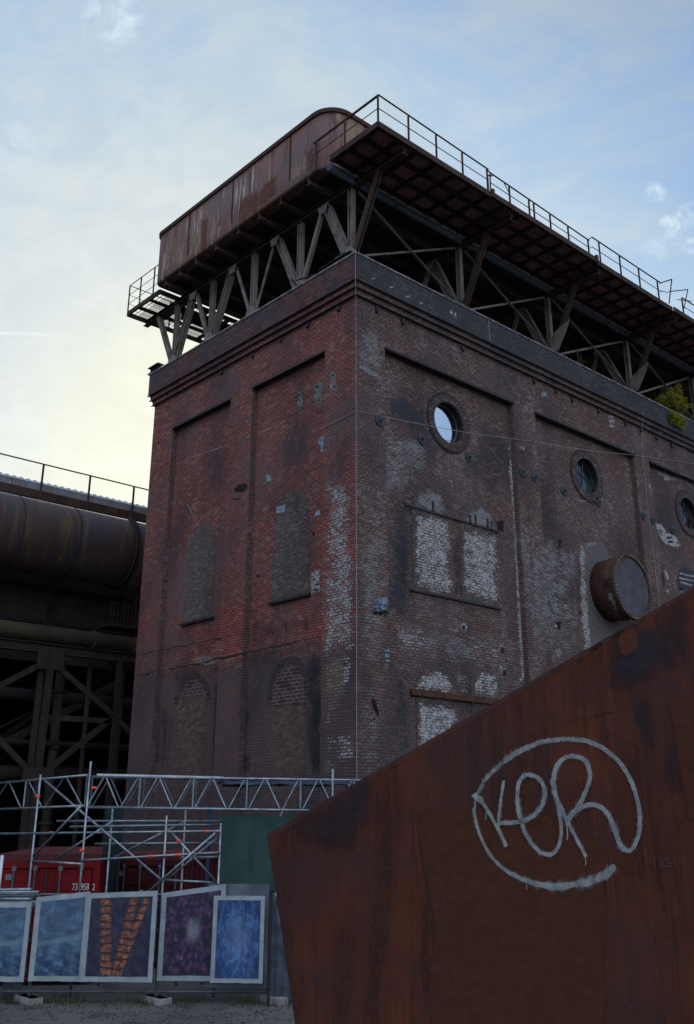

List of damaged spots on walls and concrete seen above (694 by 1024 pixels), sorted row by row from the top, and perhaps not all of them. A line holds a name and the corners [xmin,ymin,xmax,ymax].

crack [136,632,321,677]
damp [306,485,388,764]
corrosion [419,807,606,1024]